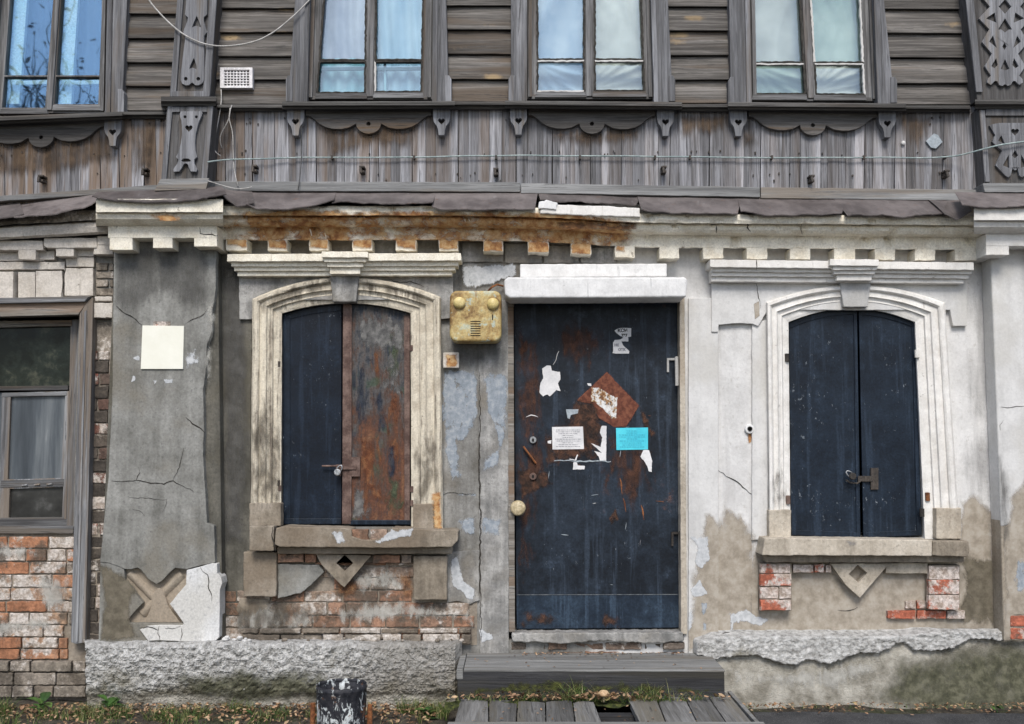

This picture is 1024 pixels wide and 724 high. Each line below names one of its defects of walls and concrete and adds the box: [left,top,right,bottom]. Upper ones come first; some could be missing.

corrosion [224,210,635,254]
peeling [442,369,508,477]
corrosion [518,348,653,497]
crack [119,453,191,516]
crack [446,372,482,638]
peeling [459,518,500,535]
flaking render [99,550,493,645]
peeling [688,537,710,631]
peeling [730,610,768,630]